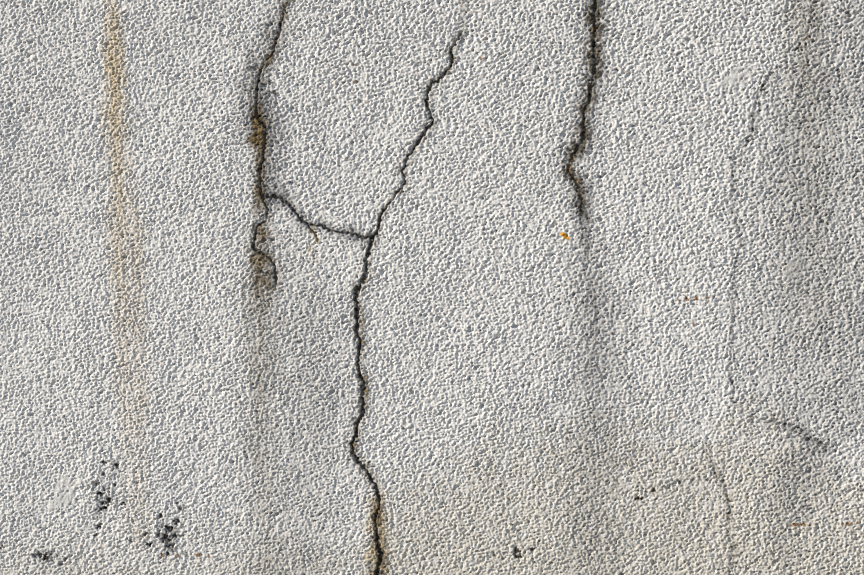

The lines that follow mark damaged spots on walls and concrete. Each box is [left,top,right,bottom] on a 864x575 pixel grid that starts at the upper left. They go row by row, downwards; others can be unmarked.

crack [562,0,602,213]
crack [246,1,460,574]
mould [95,461,126,510]
mould [144,502,183,555]